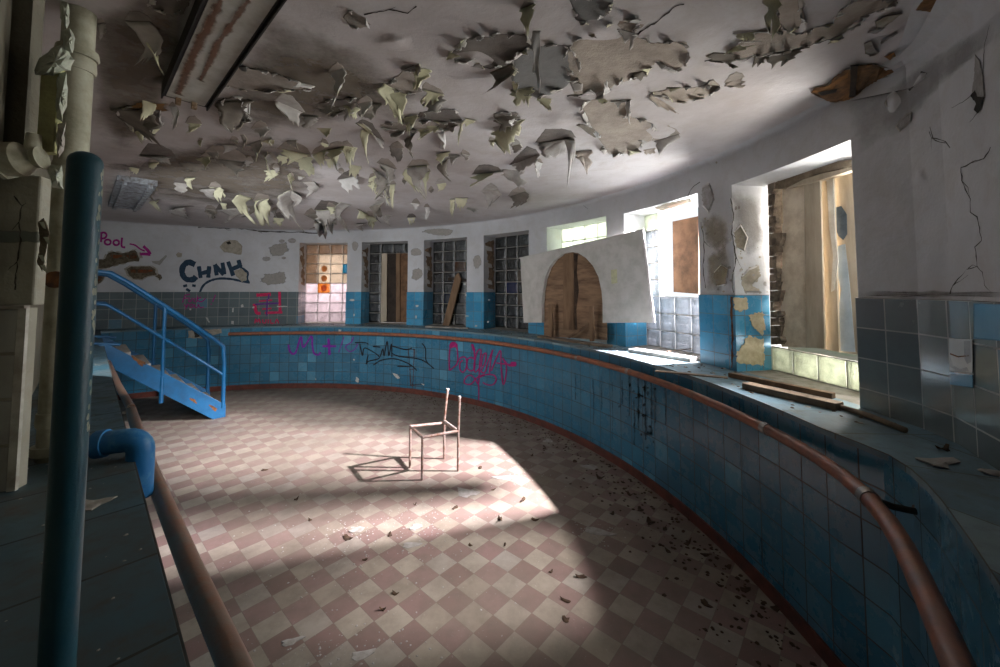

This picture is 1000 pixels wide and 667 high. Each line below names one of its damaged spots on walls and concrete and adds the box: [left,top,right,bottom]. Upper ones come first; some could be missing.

rust [175,0,250,96]
crack [364,6,417,15]
peeling [649,0,901,114]
peeling [111,0,690,288]
crack [8,196,26,290]
flaking render [37,218,50,272]
flaking render [90,169,162,354]
peeling [655,182,714,235]
spalling [714,181,787,366]
crack [929,128,991,294]
water stain [593,376,666,448]